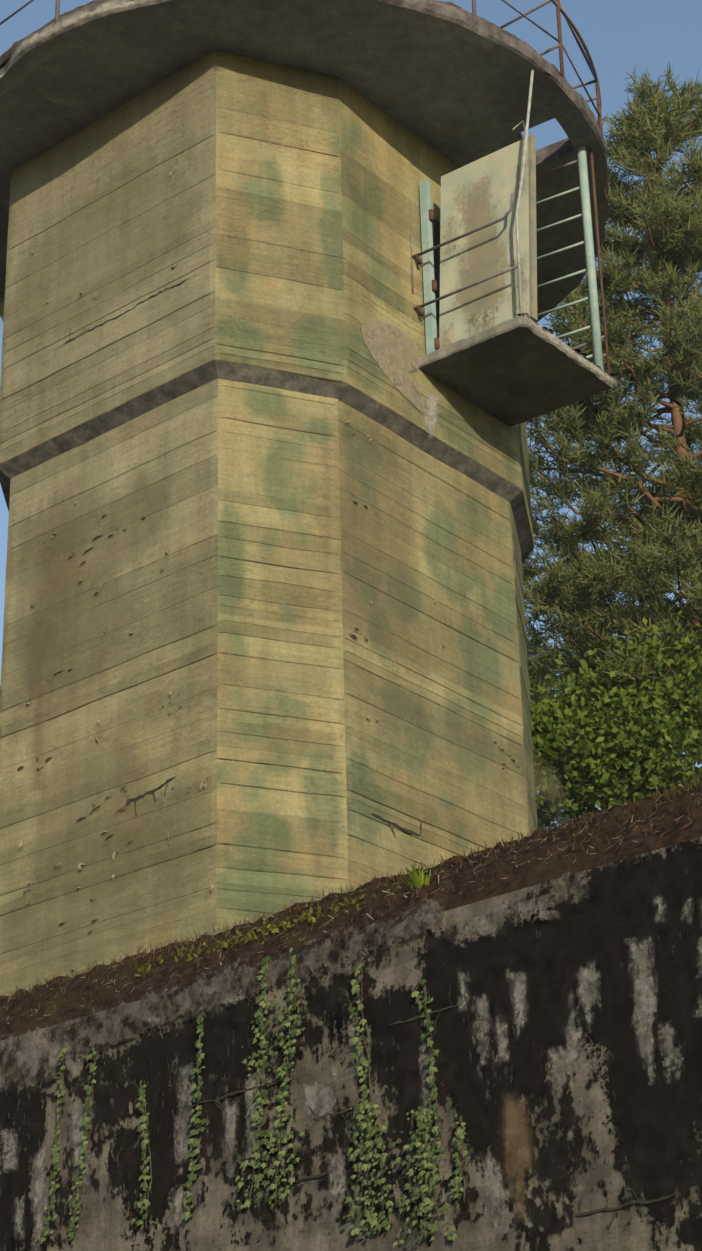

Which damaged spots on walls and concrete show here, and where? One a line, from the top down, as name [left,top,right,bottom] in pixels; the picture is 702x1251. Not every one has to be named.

spalling [68,514,128,566]
damp [0,837,702,1251]